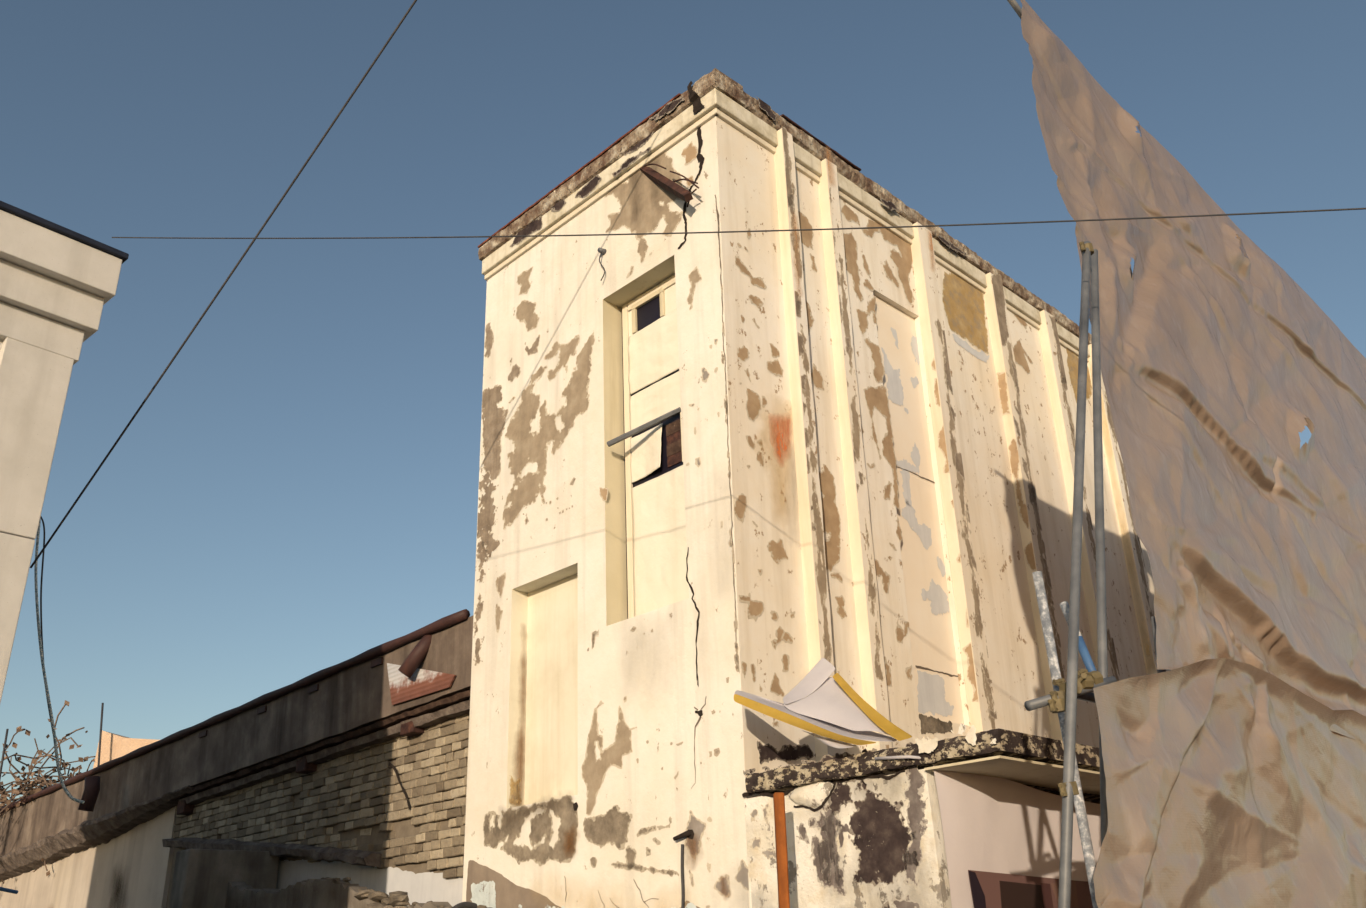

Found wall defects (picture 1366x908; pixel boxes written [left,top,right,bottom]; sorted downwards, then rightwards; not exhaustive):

peeling [510,97,698,278]
peeling [473,266,595,666]
crack [678,81,740,673]
peeling [782,126,847,678]
peeling [829,188,1065,734]
spalling [302,877,445,908]
flaking render [466,860,565,908]
peeling [483,696,776,908]
crack [686,547,706,787]
spalling [757,741,816,765]
leakage [743,748,877,774]
leakage [796,766,928,908]